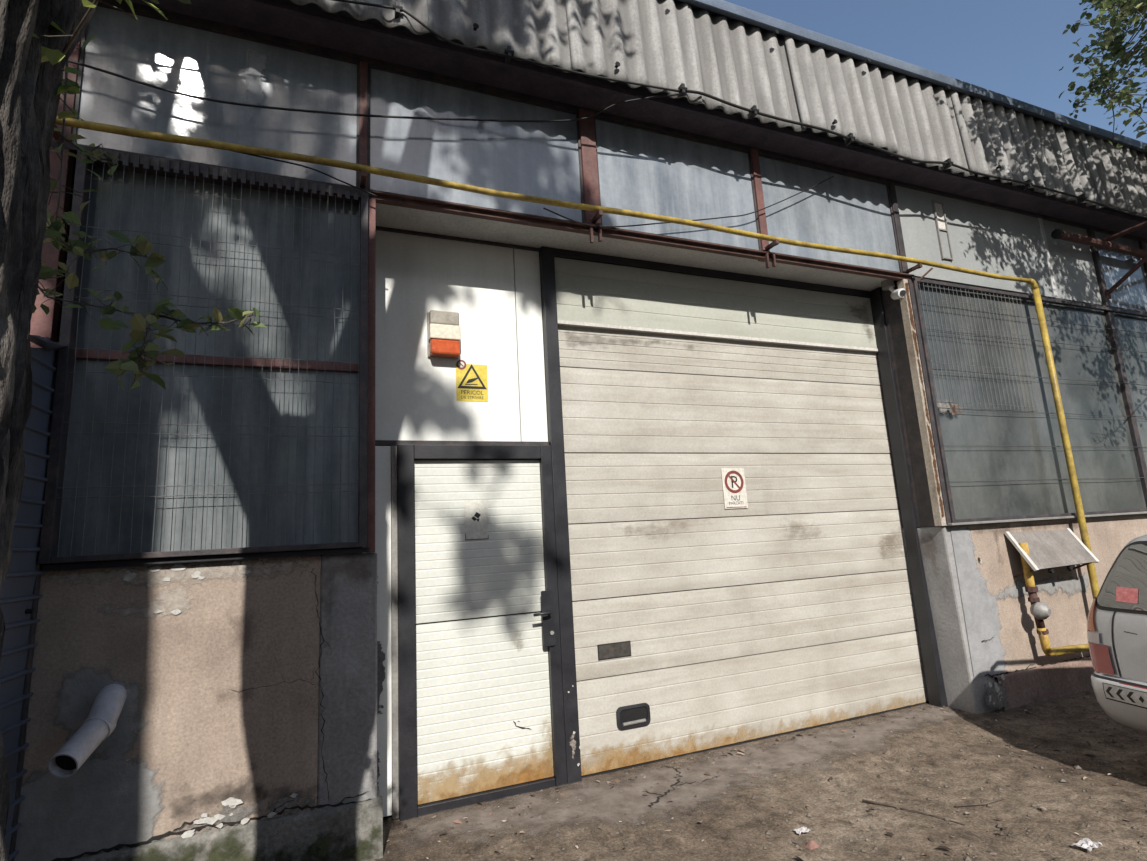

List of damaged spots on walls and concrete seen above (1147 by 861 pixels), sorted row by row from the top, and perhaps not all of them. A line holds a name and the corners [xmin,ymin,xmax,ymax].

corrosion [905,283,961,517]
peeling [46,557,310,618]
peeling [377,641,385,714]
crack [52,570,372,861]
corrosion [417,743,553,805]
corrosion [581,712,848,776]
spalling [163,793,316,838]